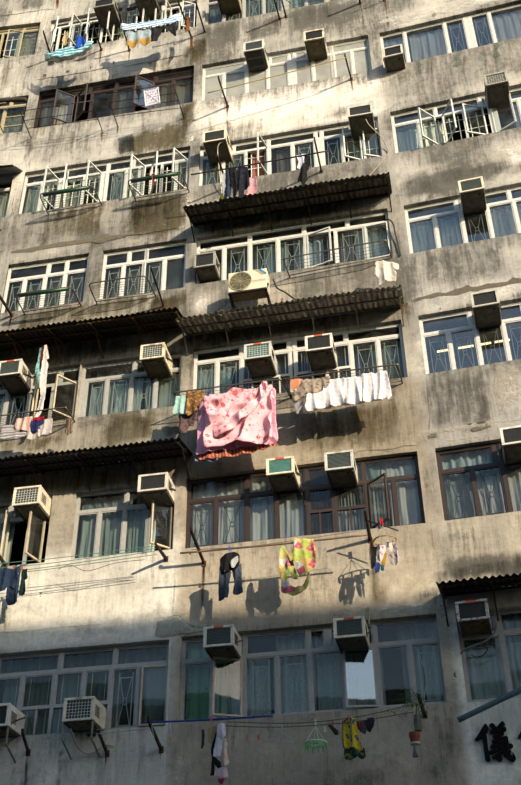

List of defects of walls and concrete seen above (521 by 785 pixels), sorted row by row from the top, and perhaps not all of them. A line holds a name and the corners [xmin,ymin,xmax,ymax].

flaking render [0,232,146,253]
flaking render [413,277,521,302]